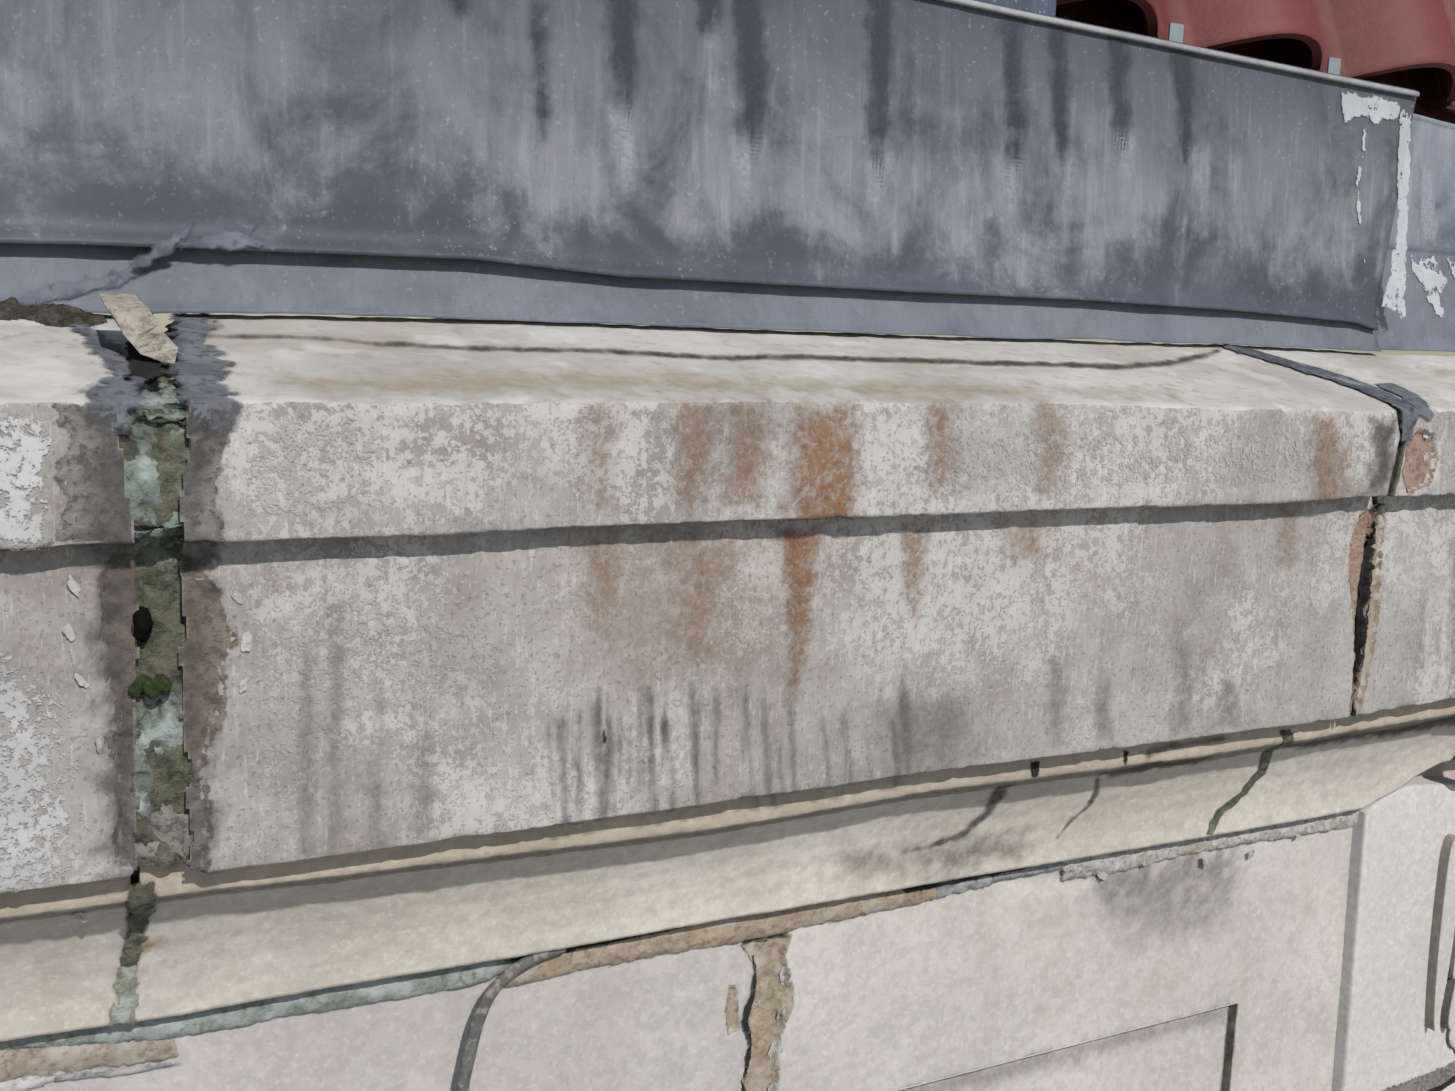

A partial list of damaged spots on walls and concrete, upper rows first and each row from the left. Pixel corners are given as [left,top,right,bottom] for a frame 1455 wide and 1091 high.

water stain [609,0,636,187]
water stain [870,0,890,137]
water stain [1052,27,1072,218]
water stain [1172,49,1208,210]
peeling [1341,91,1455,318]
rust [931,409,951,493]
rust [786,410,854,683]
crack [1348,504,1388,717]
crack [1065,738,1224,828]
crack [1207,730,1294,835]
crack [109,882,157,1027]
peeling [0,1070,63,1091]